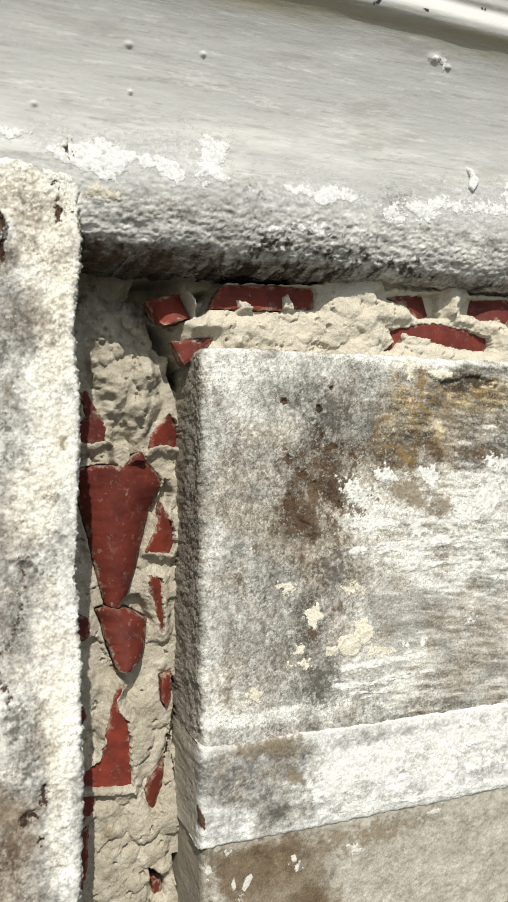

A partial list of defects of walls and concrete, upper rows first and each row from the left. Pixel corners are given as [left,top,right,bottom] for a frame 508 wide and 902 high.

peeling [0,110,508,240]
crack [0,211,9,262]
water stain [205,808,441,902]